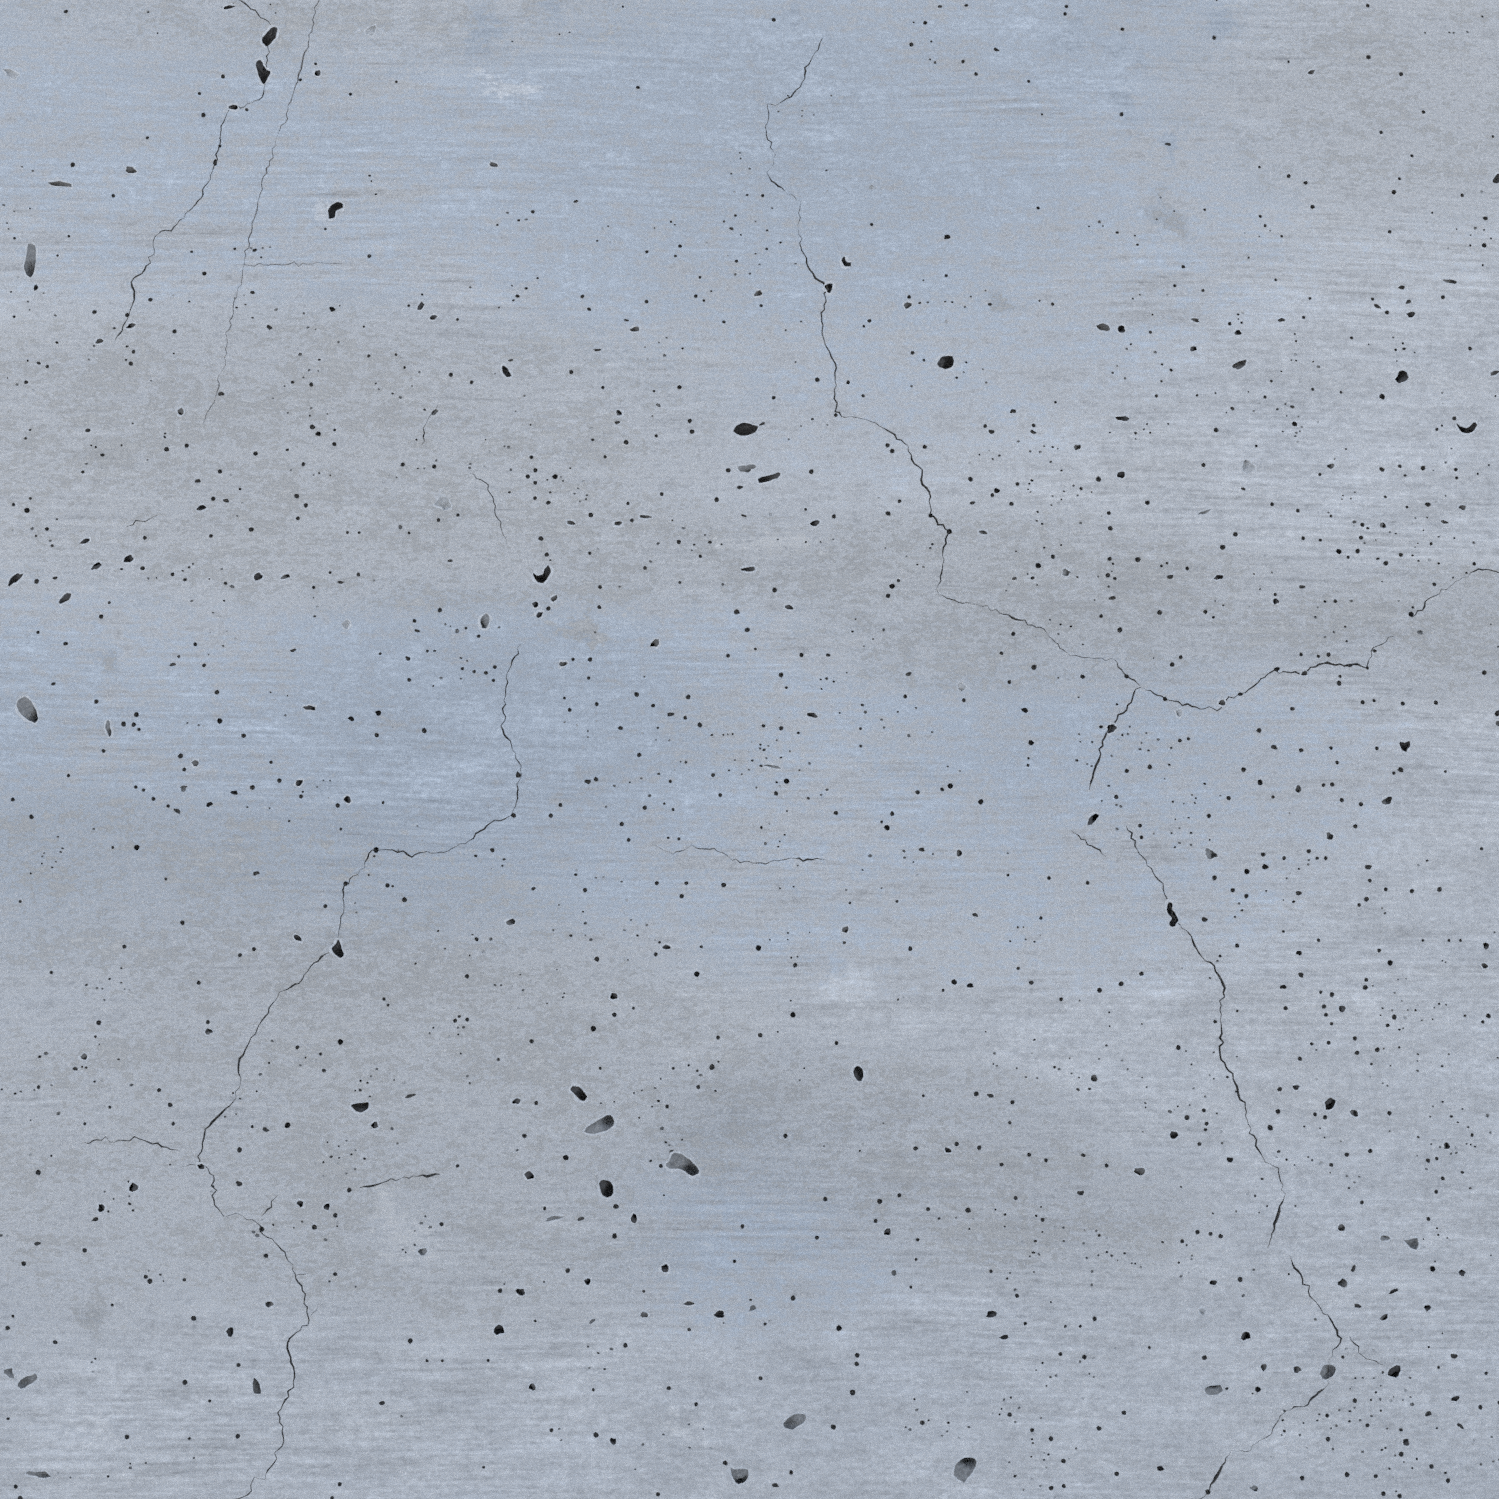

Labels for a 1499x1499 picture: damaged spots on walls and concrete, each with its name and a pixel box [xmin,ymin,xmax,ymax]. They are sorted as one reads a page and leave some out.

crack [115,0,288,340]
crack [765,38,1499,790]
crack [84,645,522,1499]
crack [1072,826,1382,1499]